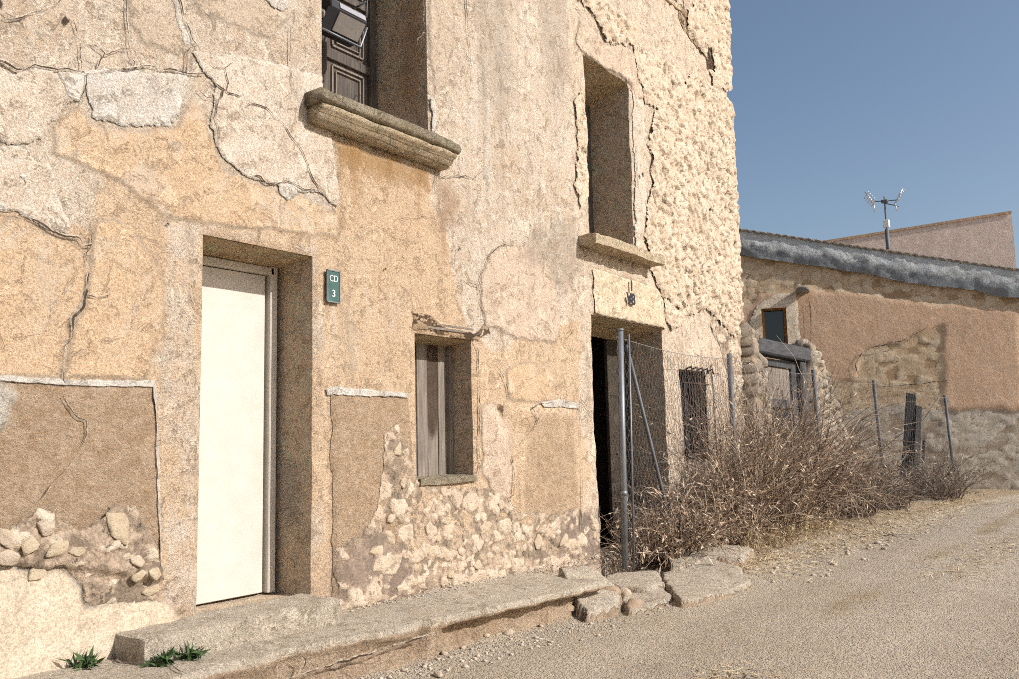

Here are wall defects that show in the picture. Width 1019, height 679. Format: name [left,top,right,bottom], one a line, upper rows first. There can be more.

crack [0,0,337,208]
spalling [572,91,589,209]
spalling [575,0,745,438]
crack [0,211,111,500]
spalling [0,504,164,606]
spalling [333,424,605,611]